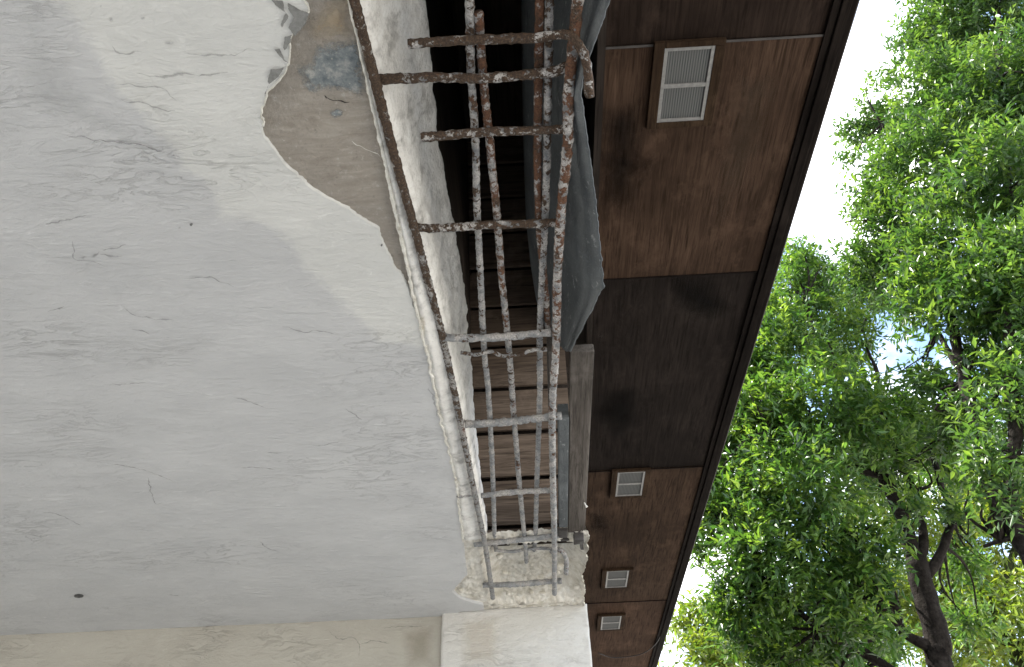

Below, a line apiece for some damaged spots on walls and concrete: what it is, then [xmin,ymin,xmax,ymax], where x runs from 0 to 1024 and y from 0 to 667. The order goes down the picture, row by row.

spalling [260,0,594,610]